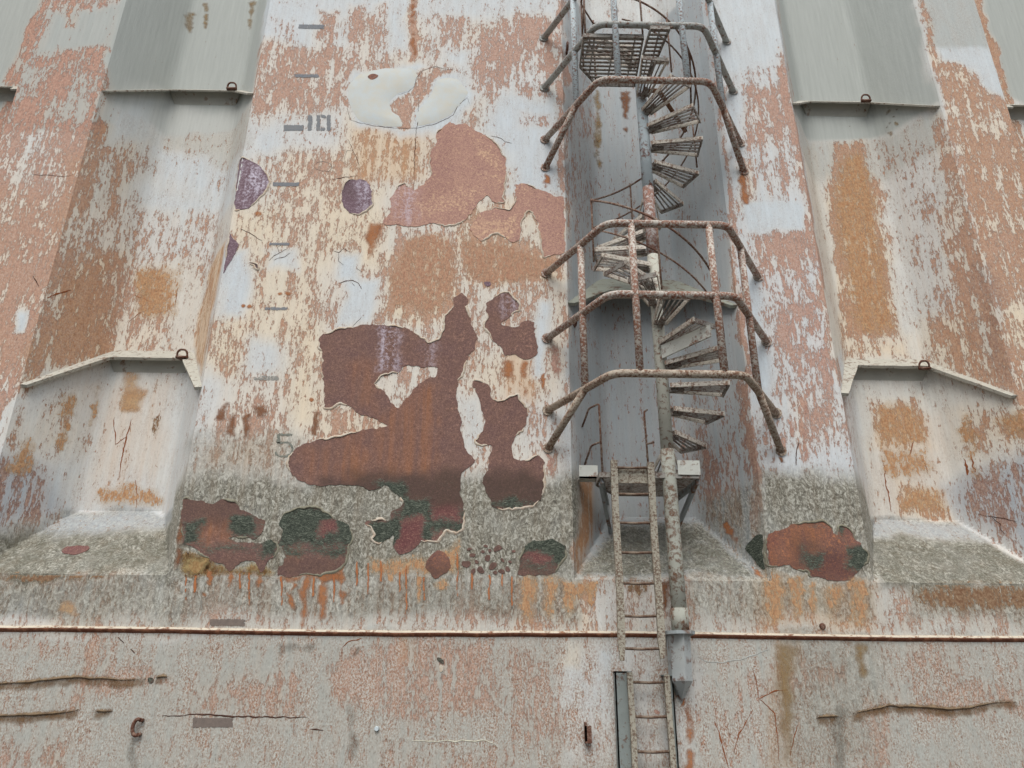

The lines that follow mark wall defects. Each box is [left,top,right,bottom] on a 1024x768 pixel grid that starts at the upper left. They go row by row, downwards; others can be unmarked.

peeling [234,156,271,212]
peeling [342,179,374,215]
peeling [383,122,566,258]
rust [831,153,897,337]
peeling [285,282,568,579]
rust [876,403,933,479]
peeling [180,497,354,578]
rust [176,521,473,618]
rust [488,574,598,621]
peeling [745,518,870,581]